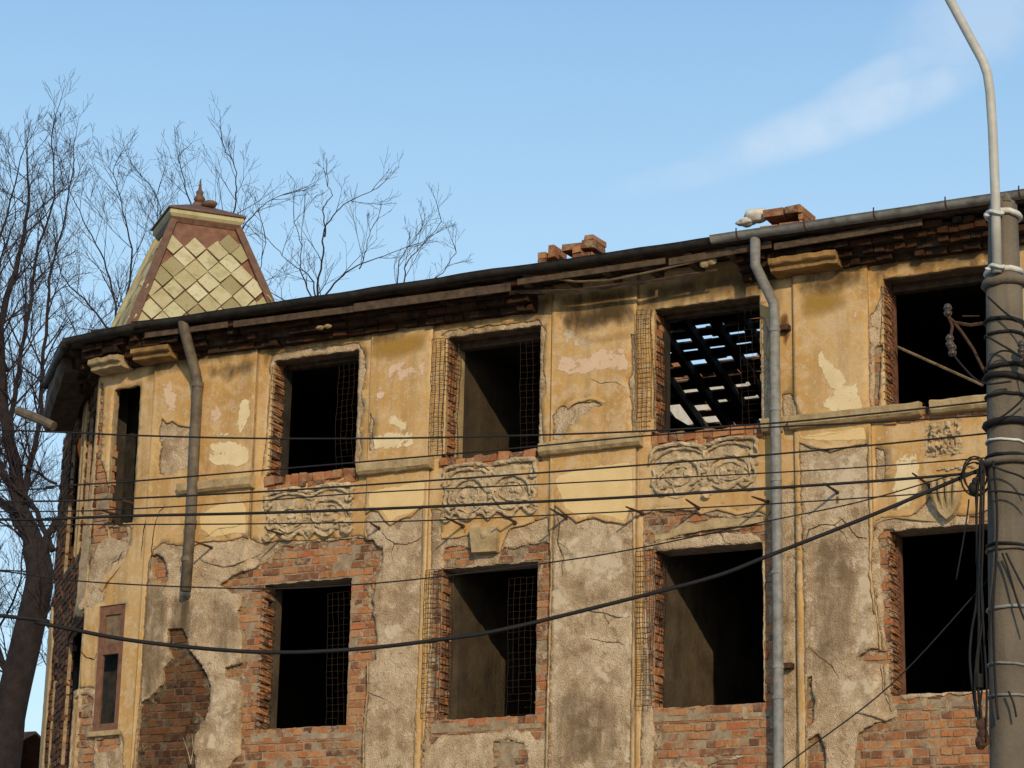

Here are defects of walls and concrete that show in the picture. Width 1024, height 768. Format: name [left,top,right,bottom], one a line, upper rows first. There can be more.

spalling [267,343,414,466]
spalling [441,320,602,443]
peeling [557,329,636,433]
peeling [817,282,889,411]
flaking render [44,381,989,768]